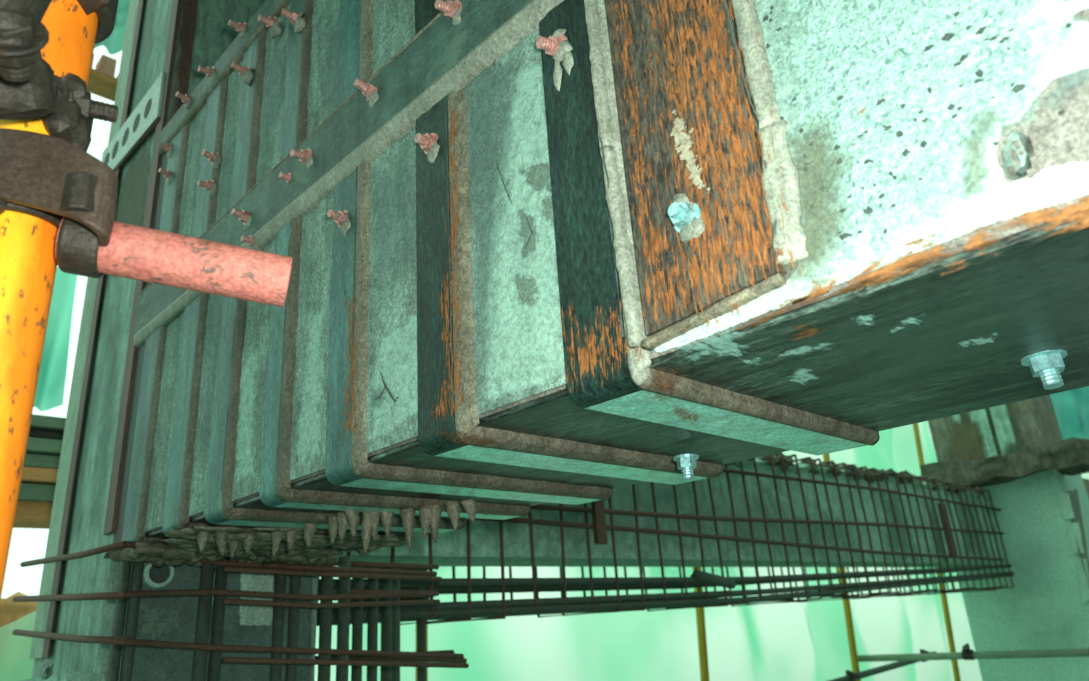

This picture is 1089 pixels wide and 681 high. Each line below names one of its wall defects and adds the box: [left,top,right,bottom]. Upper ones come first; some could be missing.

corrosion [431,108,501,449]
corrosion [560,301,642,393]
corrosion [644,367,699,422]
corrosion [610,0,1089,342]
peeling [654,0,1089,352]